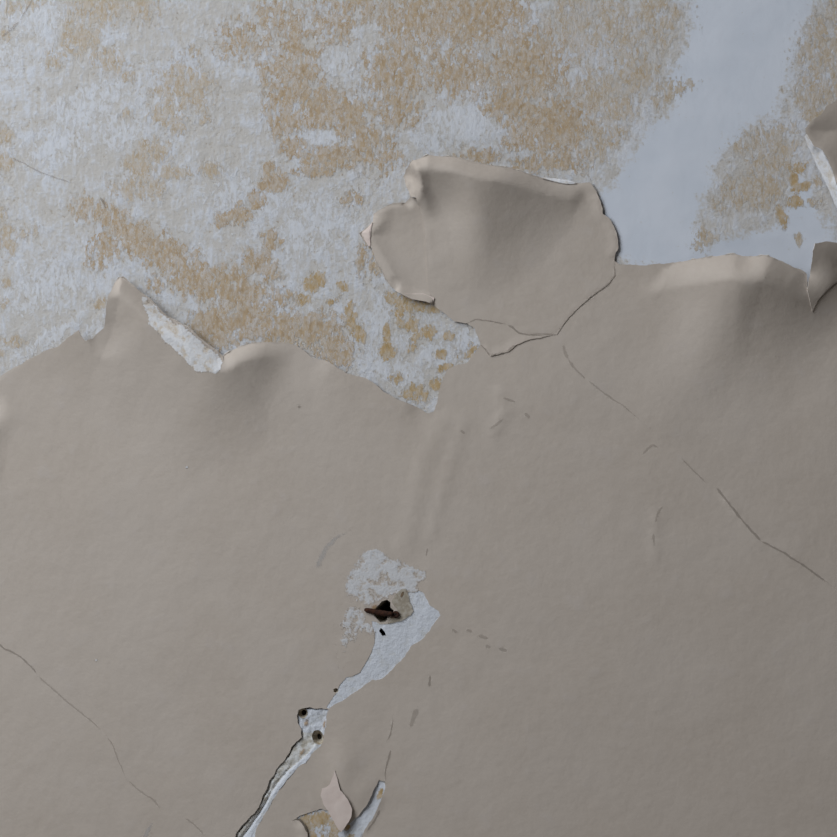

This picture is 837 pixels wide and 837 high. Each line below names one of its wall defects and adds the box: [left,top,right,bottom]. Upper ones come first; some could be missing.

water stain [707,0,837,248]
peeling [805,99,837,208]
peeling [106,276,319,407]
peeling [359,154,618,356]
peeling [674,241,837,334]
spalling [236,548,440,837]